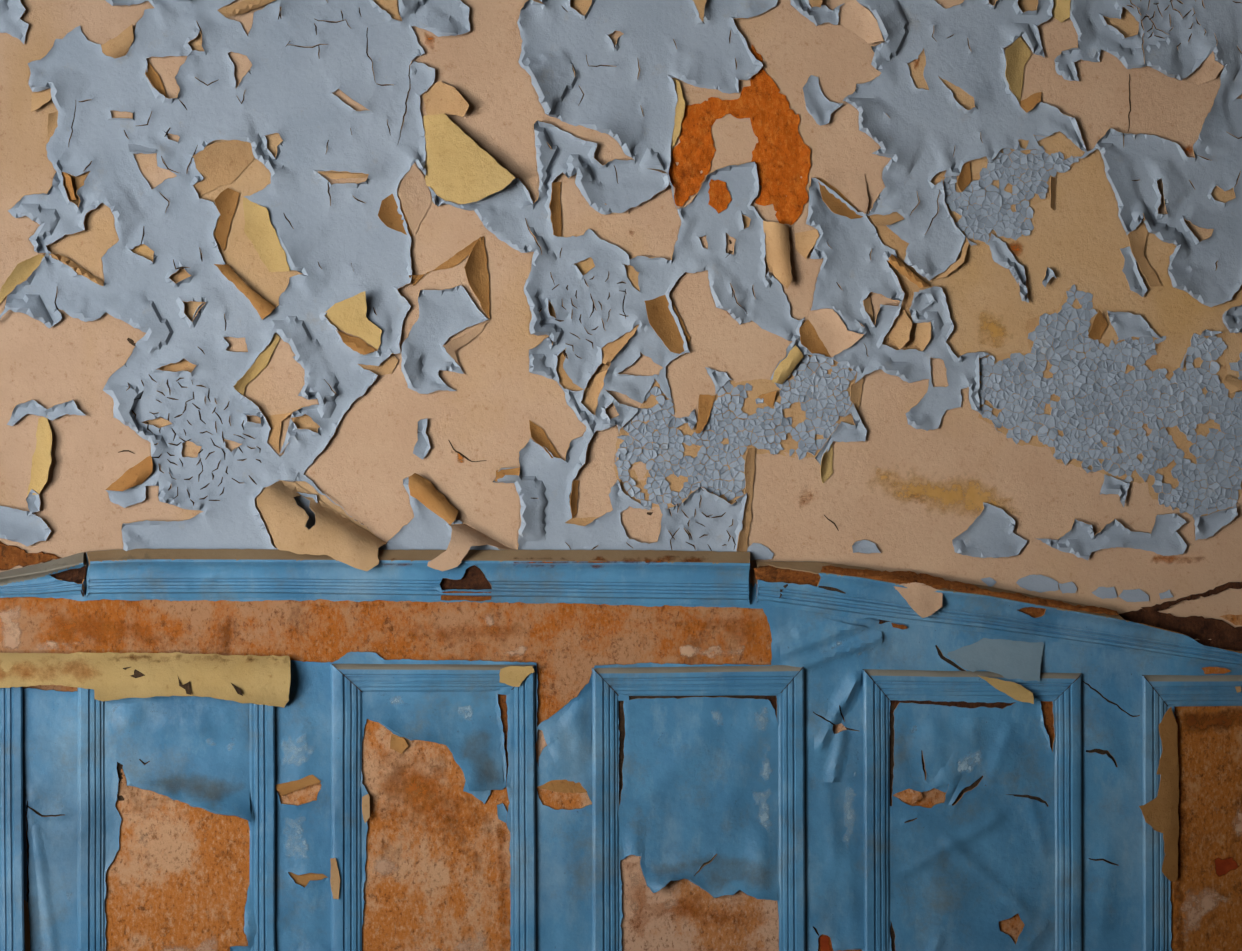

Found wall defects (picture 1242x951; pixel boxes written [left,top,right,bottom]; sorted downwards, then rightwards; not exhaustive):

crack [118,314,262,505]
peeling [0,0,779,951]
crack [525,218,635,359]
crack [613,324,868,551]
peeling [549,0,1242,627]
crack [910,134,1080,247]
crack [978,284,1242,518]
peeling [999,914,1024,943]
peeling [1139,686,1242,951]